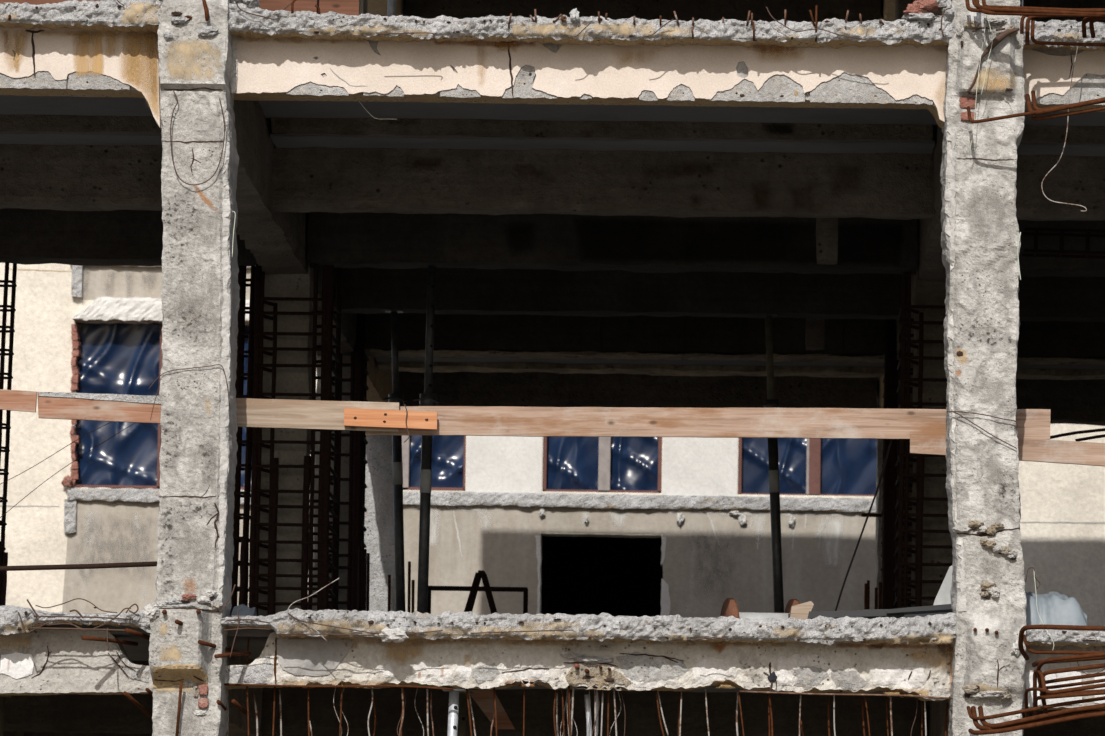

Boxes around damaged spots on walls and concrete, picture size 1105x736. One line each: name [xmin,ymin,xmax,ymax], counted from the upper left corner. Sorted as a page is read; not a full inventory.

crack [12,30,44,77]
peeling [286,73,349,96]
peeling [363,85,404,97]
peeling [440,65,481,98]
peeling [502,65,558,99]
peeling [639,84,695,101]
peeling [709,62,933,105]
crack [165,141,229,175]
spalling [979,580,1000,599]
spalling [224,535,951,736]
spalling [961,684,1013,700]